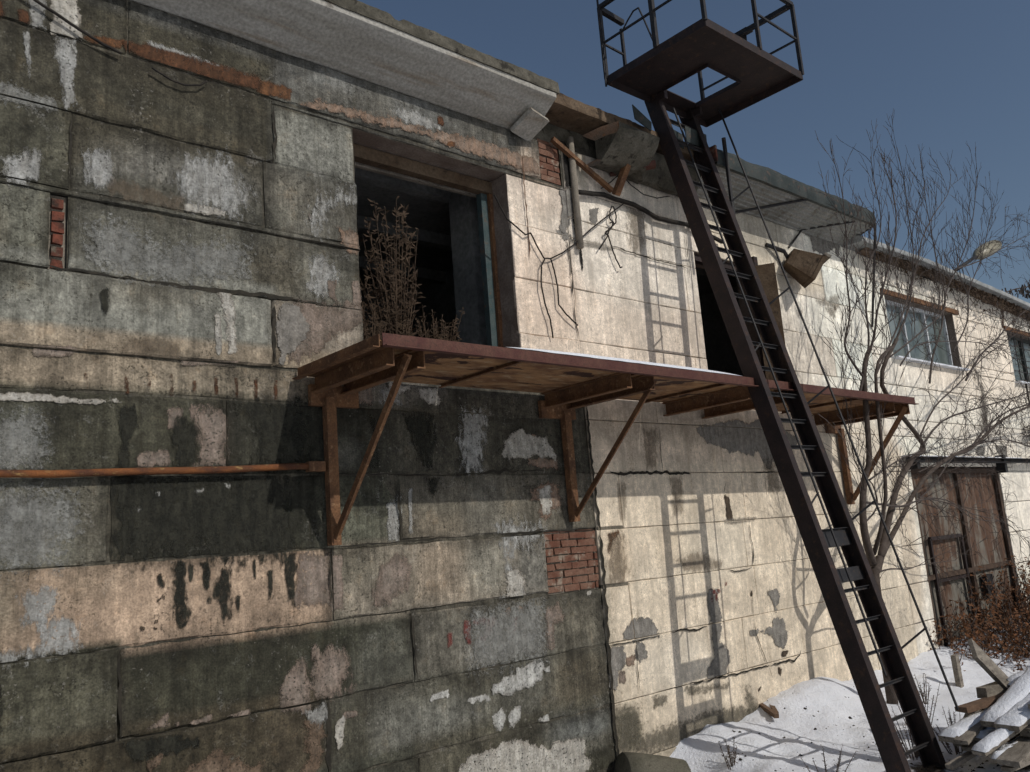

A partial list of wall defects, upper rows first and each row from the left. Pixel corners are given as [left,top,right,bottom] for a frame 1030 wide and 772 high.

rust [85,36,292,101]
peeling [300,98,541,174]
peeling [502,429,562,521]
leakage [188,558,241,624]
leakage [253,553,298,605]
crack [586,406,707,756]
crack [691,525,801,684]
peeling [147,713,212,729]
peeling [280,644,358,772]
peeling [430,688,450,702]
peeling [459,662,593,772]